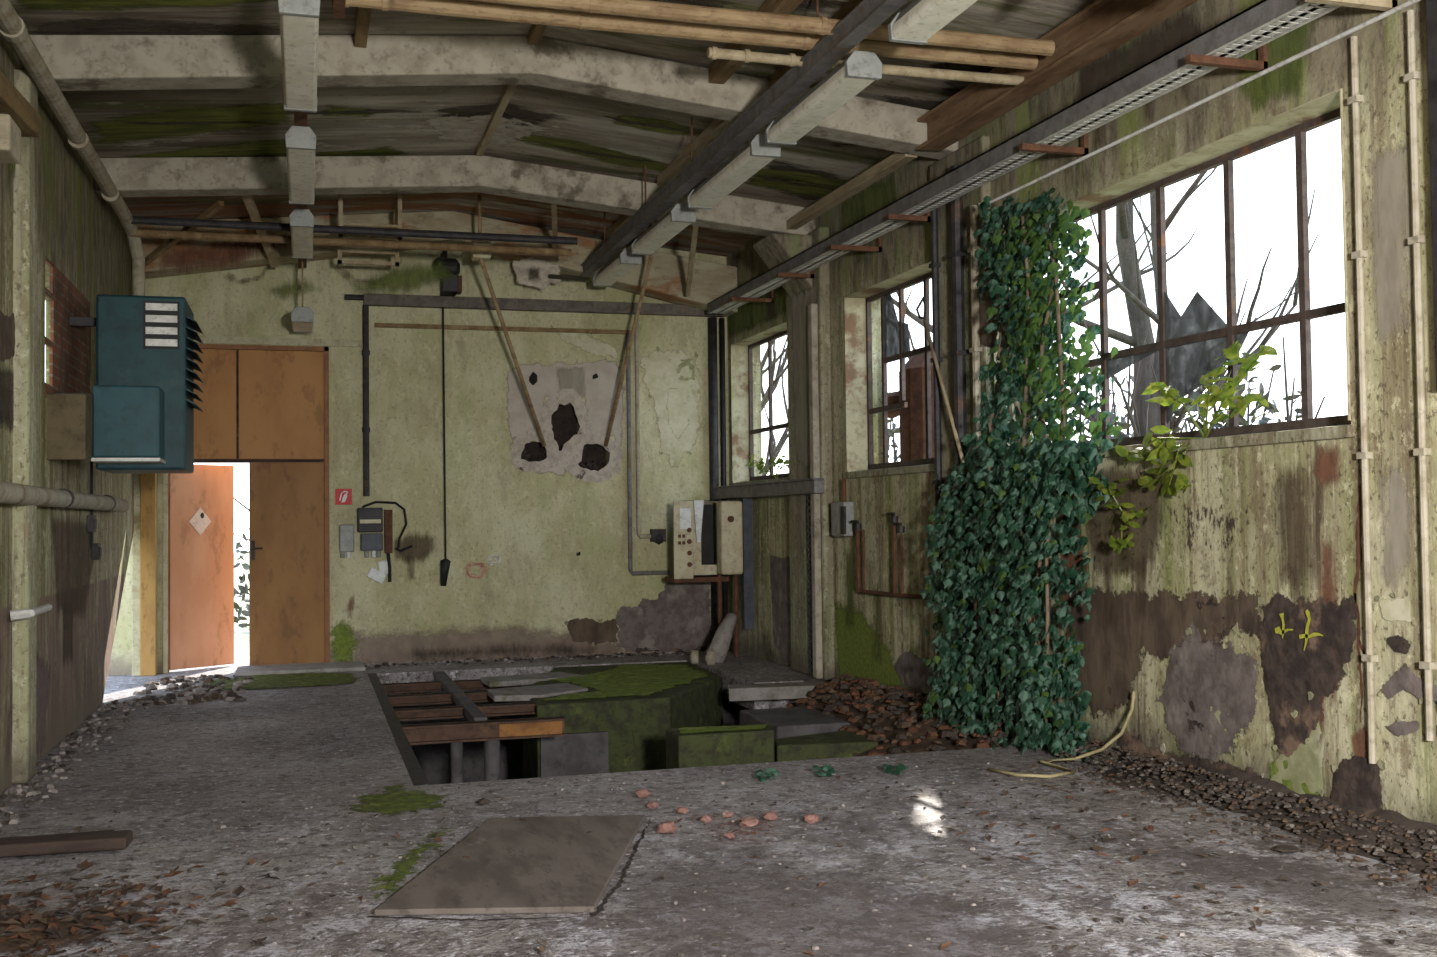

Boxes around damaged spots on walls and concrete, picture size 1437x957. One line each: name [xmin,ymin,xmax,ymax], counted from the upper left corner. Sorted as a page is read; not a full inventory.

peeling [507,325,701,482]
water stain [53,519,93,663]
flaking render [564,582,712,652]
flaking render [1068,584,1388,810]
flaking render [1386,718,1419,737]
flaking render [1375,595,1437,706]